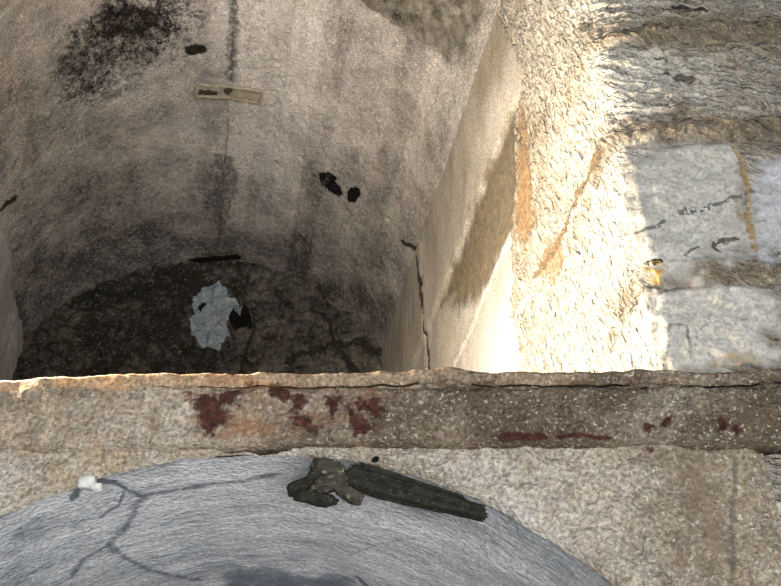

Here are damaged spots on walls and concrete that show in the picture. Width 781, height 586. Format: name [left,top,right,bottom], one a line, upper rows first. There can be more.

leakage [58,0,207,99]
leakage [362,0,483,59]
crack [0,195,17,211]
leakage [448,108,523,305]
flaking render [189,280,252,351]
crack [400,240,430,369]
rust [185,383,257,439]
rust [268,383,323,436]
rust [324,388,386,437]